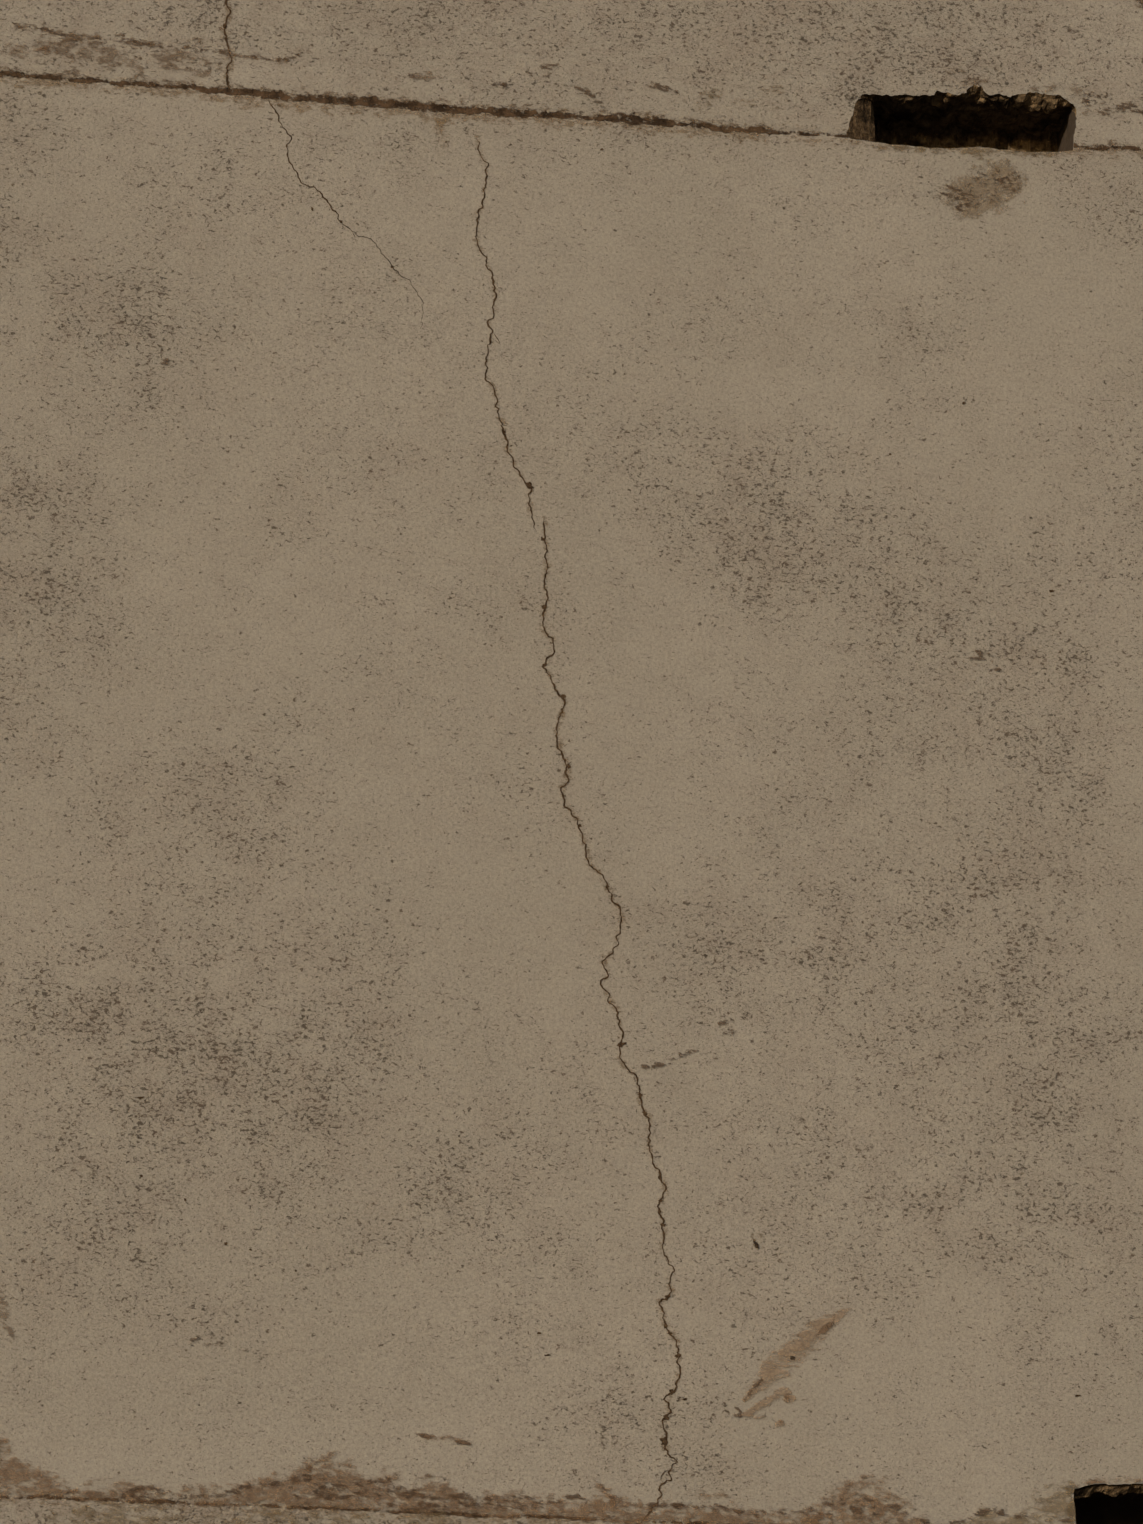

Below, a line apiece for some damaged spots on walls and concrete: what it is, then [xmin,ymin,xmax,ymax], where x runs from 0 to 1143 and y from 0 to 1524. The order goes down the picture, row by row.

crack [16,0,303,88]
crack [269,101,424,329]
spalling [846,70,1141,218]
crack [475,138,687,1524]
spalling [1074,1483,1143,1524]